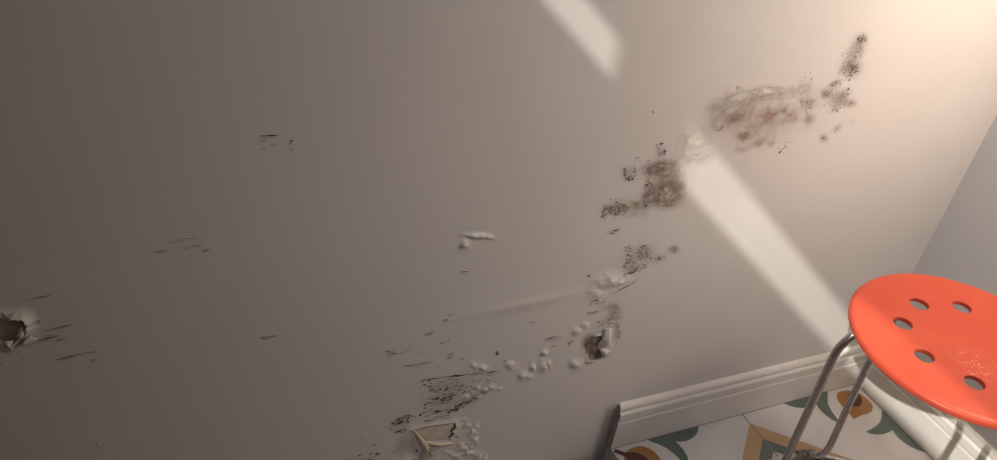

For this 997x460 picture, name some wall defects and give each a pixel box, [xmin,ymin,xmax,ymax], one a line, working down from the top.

damp [761,35,866,123]
damp [600,142,681,235]
damp [622,244,677,277]
peeling [0,306,41,355]
flaking render [579,310,619,363]
damp [390,375,495,433]
peeling [387,415,491,460]